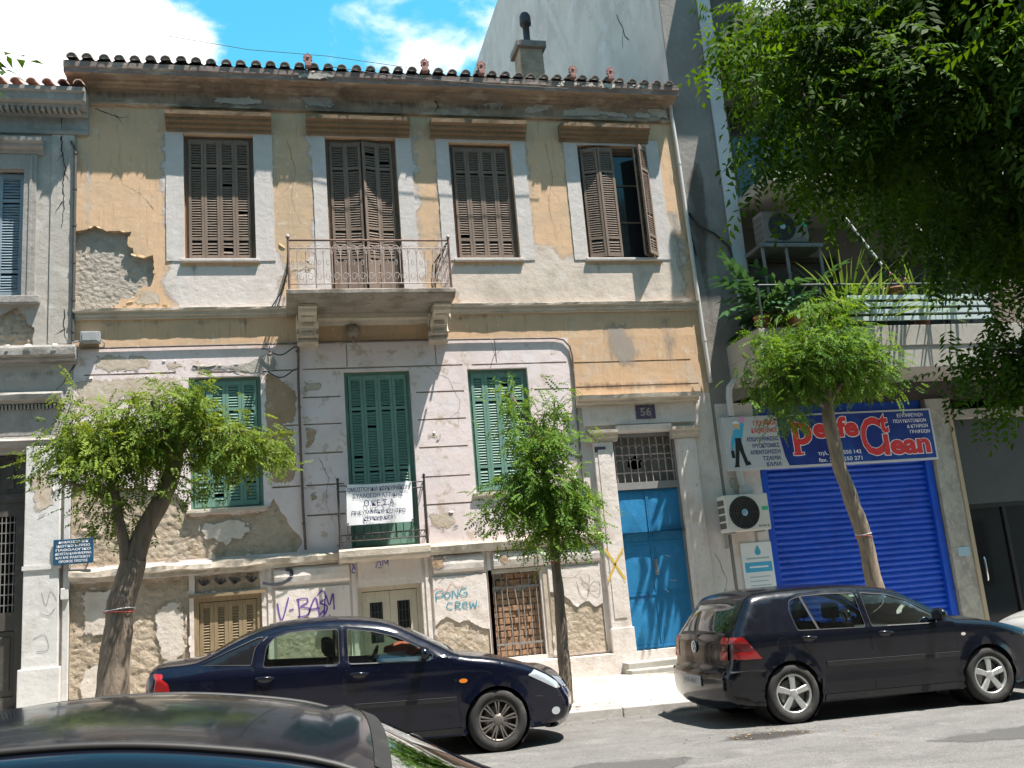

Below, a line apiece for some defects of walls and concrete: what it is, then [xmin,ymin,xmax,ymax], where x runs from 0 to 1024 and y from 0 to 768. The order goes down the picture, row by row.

crack [56,118,71,227]
spalling [75,218,319,309]
peeling [410,137,690,304]
spalling [0,308,72,353]
peeling [264,351,321,486]
spalling [71,484,156,568]
spalling [146,493,302,563]
spalling [69,581,114,700]
spalling [130,570,261,694]
spalling [435,617,491,654]
spalling [550,592,608,656]